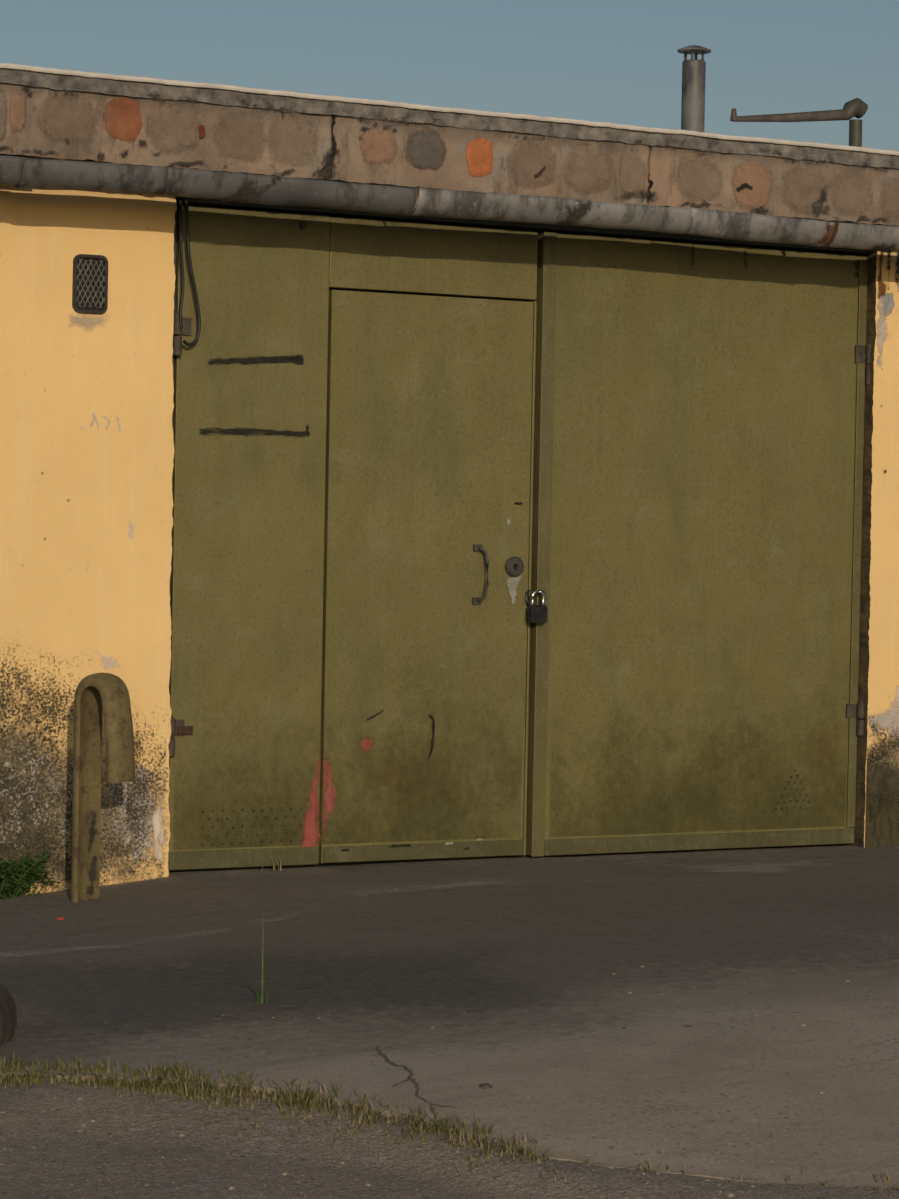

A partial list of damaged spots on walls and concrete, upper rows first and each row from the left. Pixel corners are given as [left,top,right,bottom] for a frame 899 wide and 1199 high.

peeling [877,293,895,366]
damp [0,640,78,896]
damp [100,712,169,885]
damp [865,717,899,848]
crack [375,1047,457,1119]